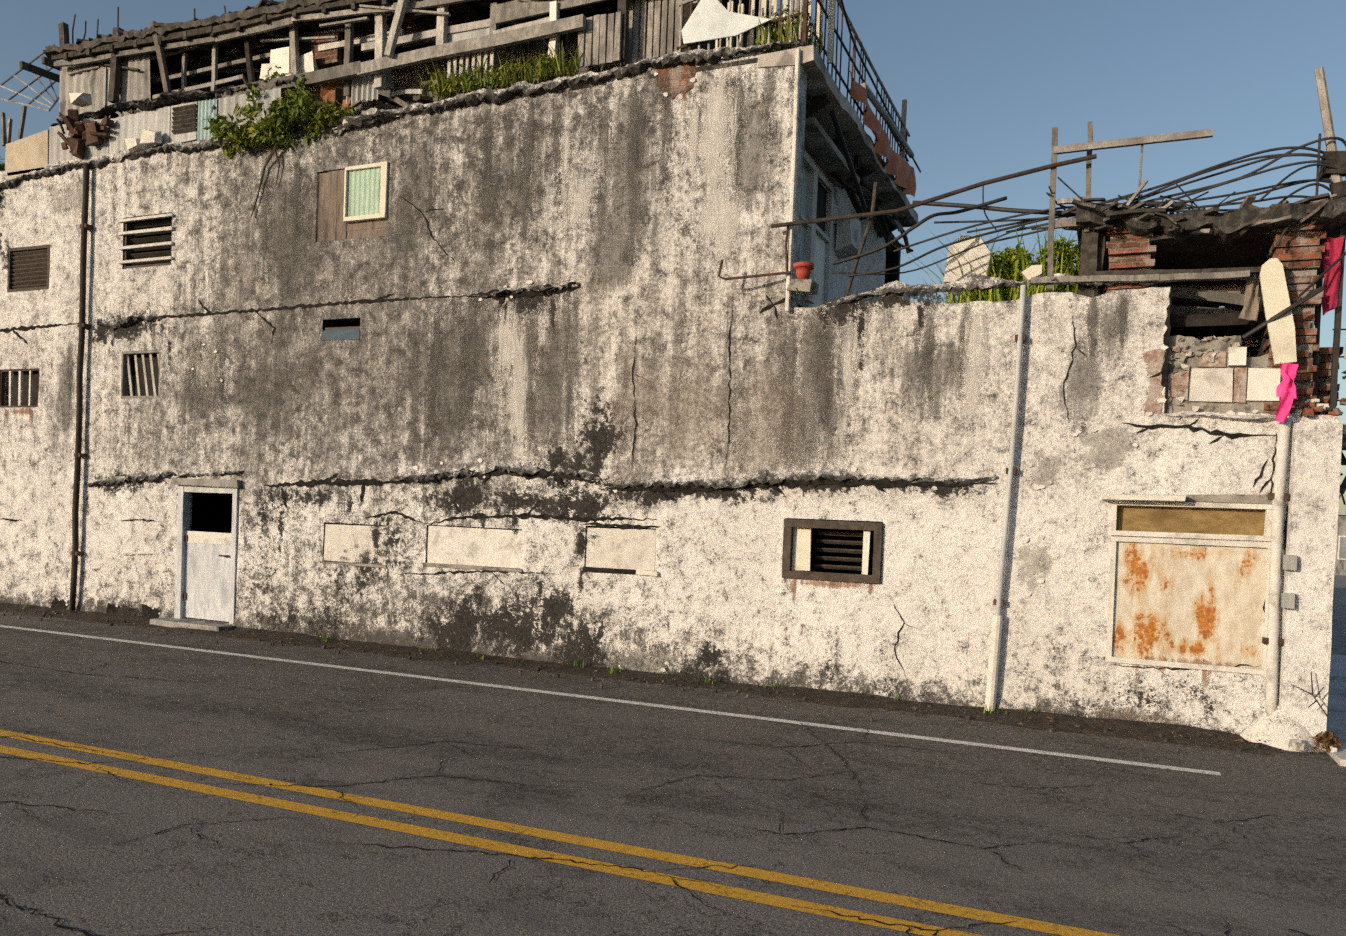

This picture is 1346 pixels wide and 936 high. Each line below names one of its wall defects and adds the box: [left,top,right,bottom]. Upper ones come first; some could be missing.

leakage [562,127,593,235]
leakage [689,66,744,259]
leakage [243,484,414,639]
crack [264,473,656,525]
leakage [488,284,570,447]
leakage [406,394,868,669]
leakage [803,285,966,455]
crack [892,600,917,671]
leakage [884,481,1002,500]
crack [1063,314,1086,421]
peeling [1142,346,1168,416]
crack [1124,289,1289,552]